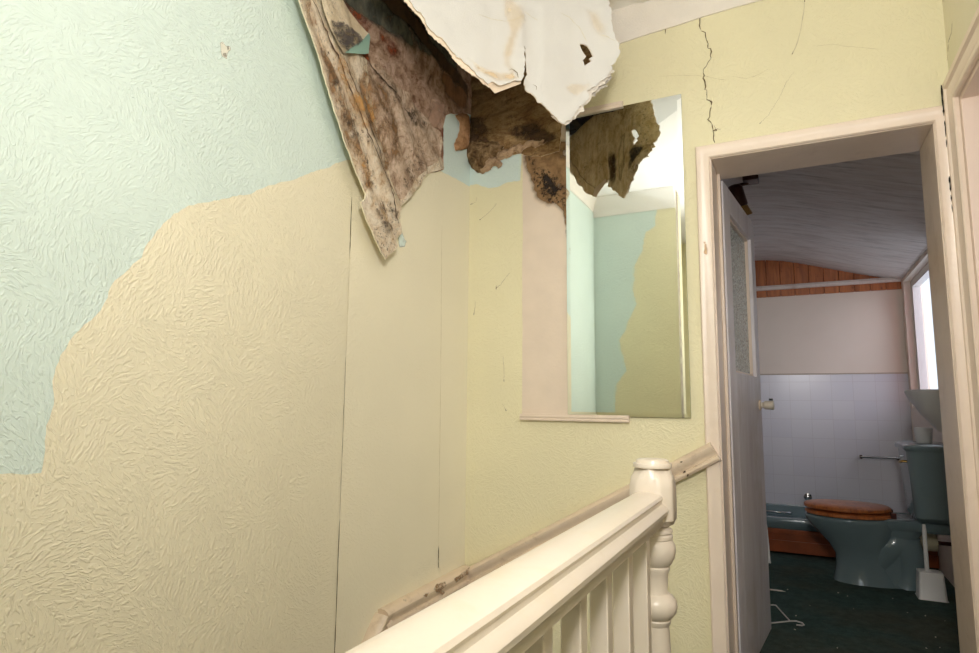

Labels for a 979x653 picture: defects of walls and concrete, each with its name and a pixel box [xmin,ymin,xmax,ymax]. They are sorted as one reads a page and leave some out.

water stain [306,0,400,191]
water stain [344,0,489,143]
crack [675,19,768,143]
water stain [512,124,566,225]